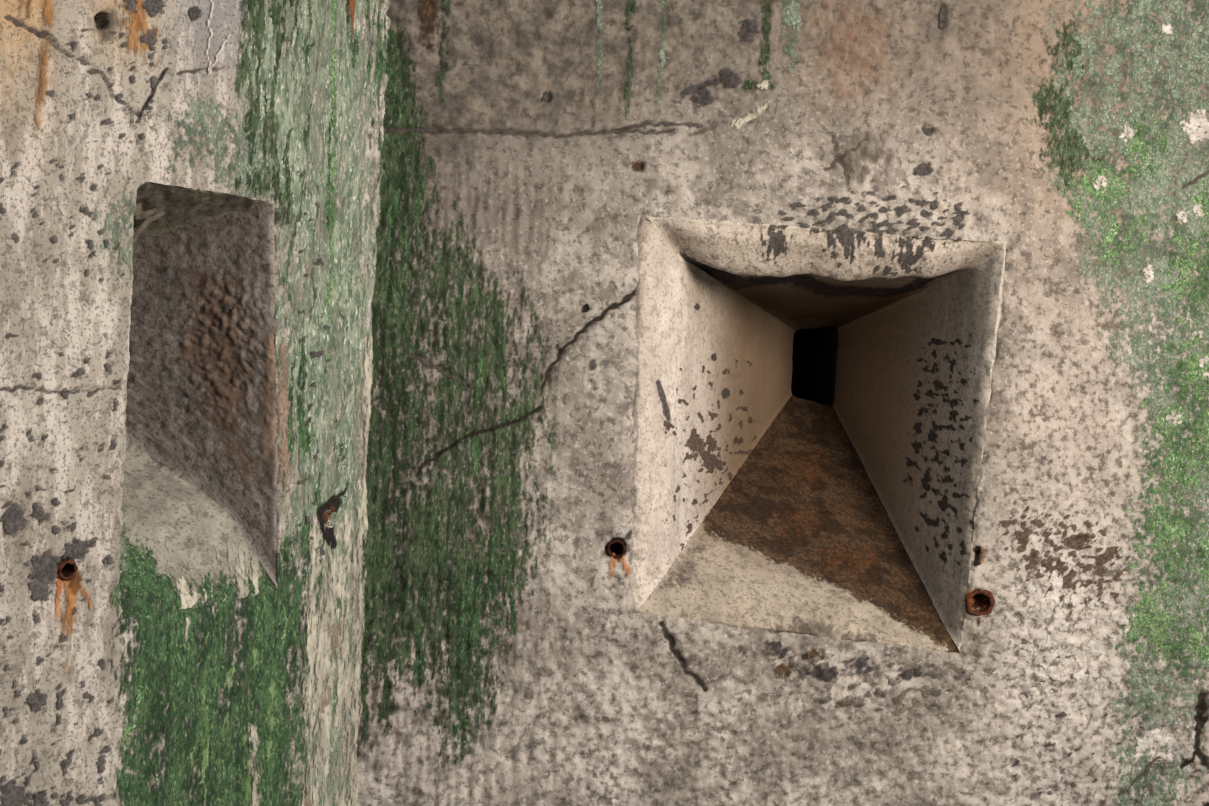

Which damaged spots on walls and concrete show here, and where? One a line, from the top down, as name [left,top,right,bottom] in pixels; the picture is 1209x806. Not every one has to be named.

rust [20,0,53,125]
crack [6,0,230,153]
rust [116,0,158,72]
damp [231,0,523,806]
crack [410,289,637,476]
damp [1006,0,1209,806]
rust [56,572,92,665]
damp [118,506,285,640]
damp [179,609,288,806]
rust [610,553,630,578]
crack [660,621,709,692]
crack [1118,691,1209,806]